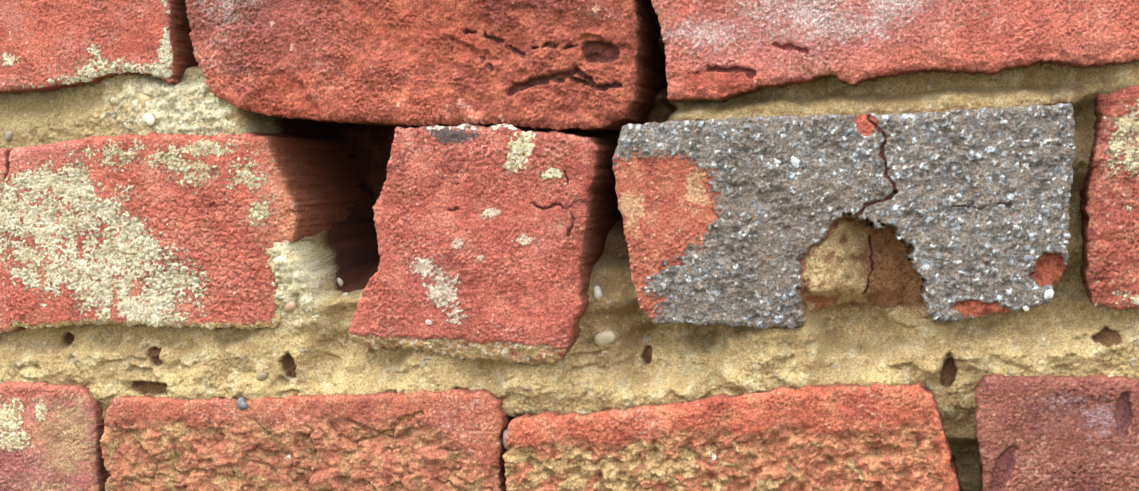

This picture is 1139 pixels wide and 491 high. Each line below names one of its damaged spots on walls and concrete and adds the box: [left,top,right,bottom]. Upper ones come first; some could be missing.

damp [663,0,922,51]
spalling [798,216,926,312]
spalling [100,415,945,491]